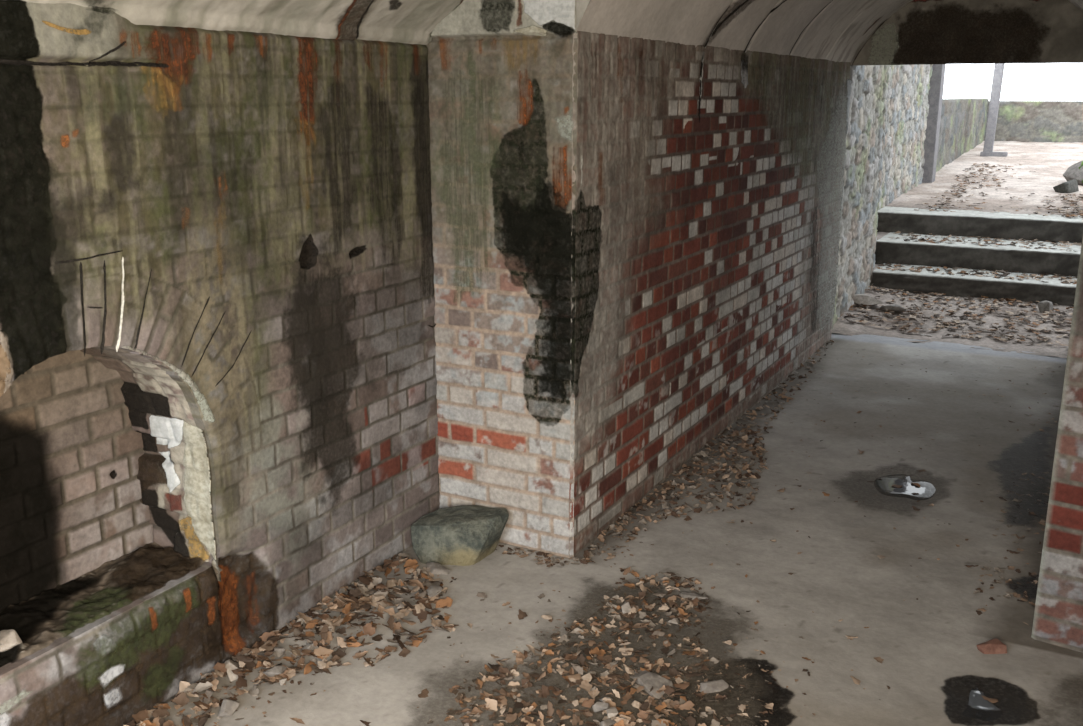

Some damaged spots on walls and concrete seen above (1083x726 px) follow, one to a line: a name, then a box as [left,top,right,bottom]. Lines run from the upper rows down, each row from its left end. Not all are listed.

crack [0,41,169,68]
rust [295,36,317,145]
crack [698,0,787,123]
crack [789,0,833,55]
leakage [869,3,1050,65]
leakage [0,0,91,380]
rust [553,107,583,208]
spalling [121,346,216,562]
leakage [0,570,221,726]
rust [207,553,279,665]